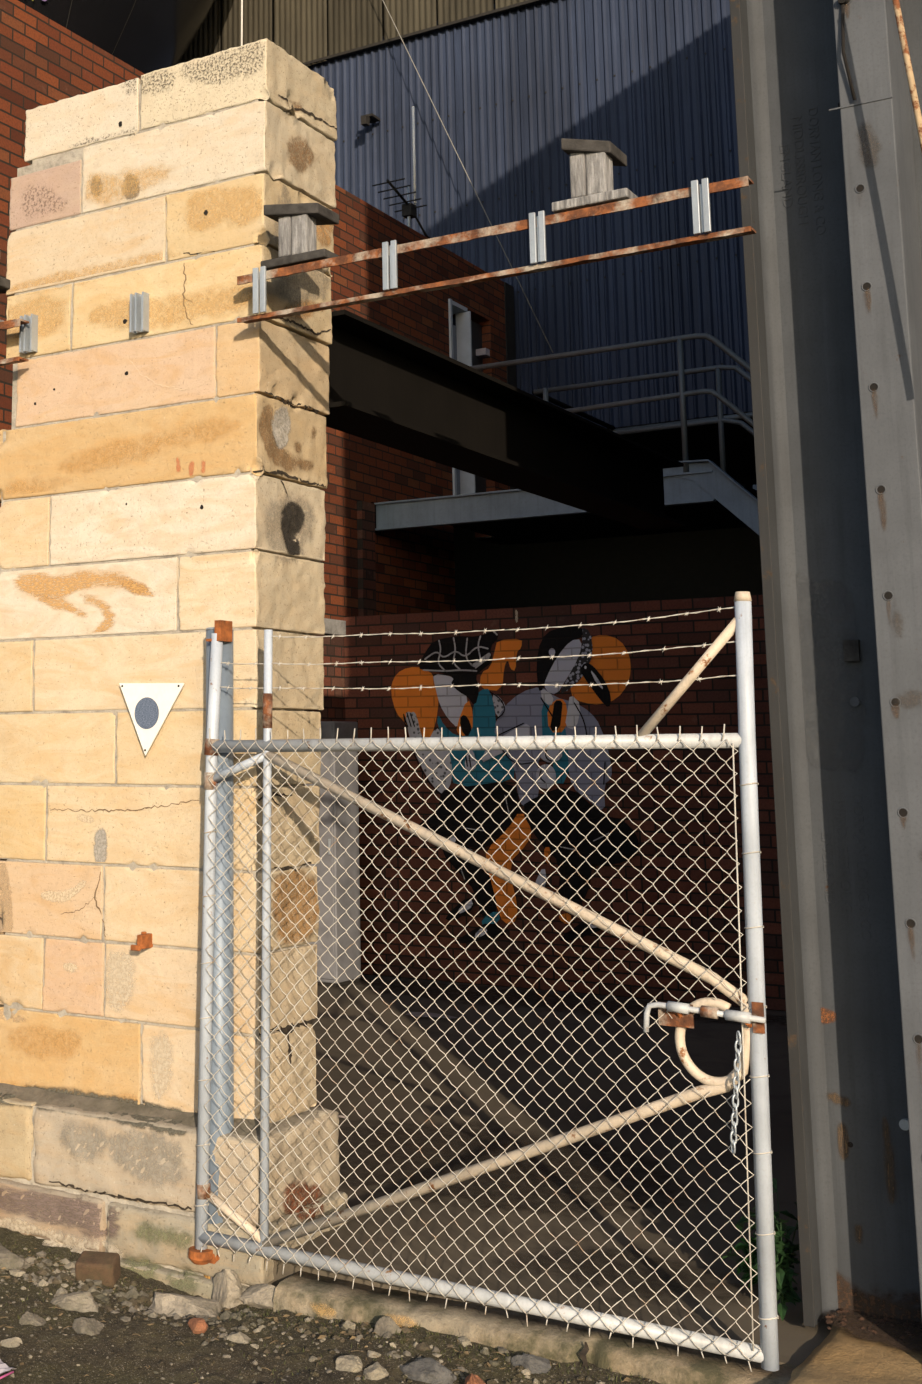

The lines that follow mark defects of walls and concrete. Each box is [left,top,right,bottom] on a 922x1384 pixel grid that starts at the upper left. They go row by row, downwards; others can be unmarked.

crack [278,94,337,129]
corrosion [316,225,333,245]
crack [50,800,199,812]
crack [63,872,106,937]
corrosion [821,1008,836,1023]
damp [62,1125,182,1184]